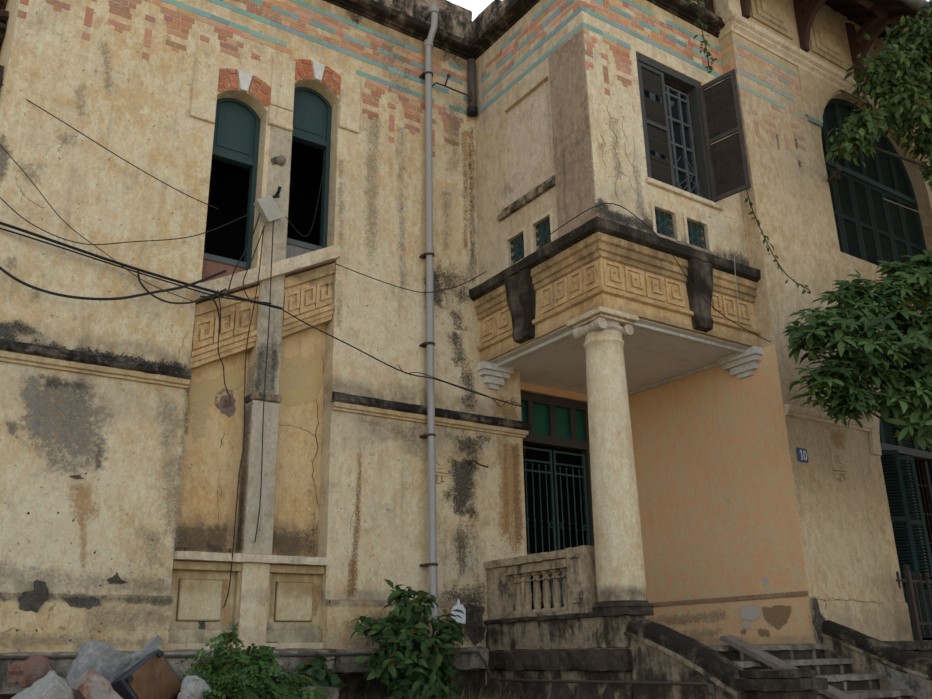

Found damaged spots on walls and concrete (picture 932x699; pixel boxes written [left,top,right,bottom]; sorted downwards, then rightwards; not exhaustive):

crack [600,102,635,202]
leakage [0,320,186,368]
leakage [7,376,107,475]
leakage [175,407,250,553]
peeling [189,368,244,441]
crack [279,401,319,545]
corrosion [347,463,361,595]
leakage [443,436,494,515]
corrosion [499,443,522,551]
flaking render [16,579,50,613]
flaking render [66,596,102,609]
peeling [739,603,791,637]